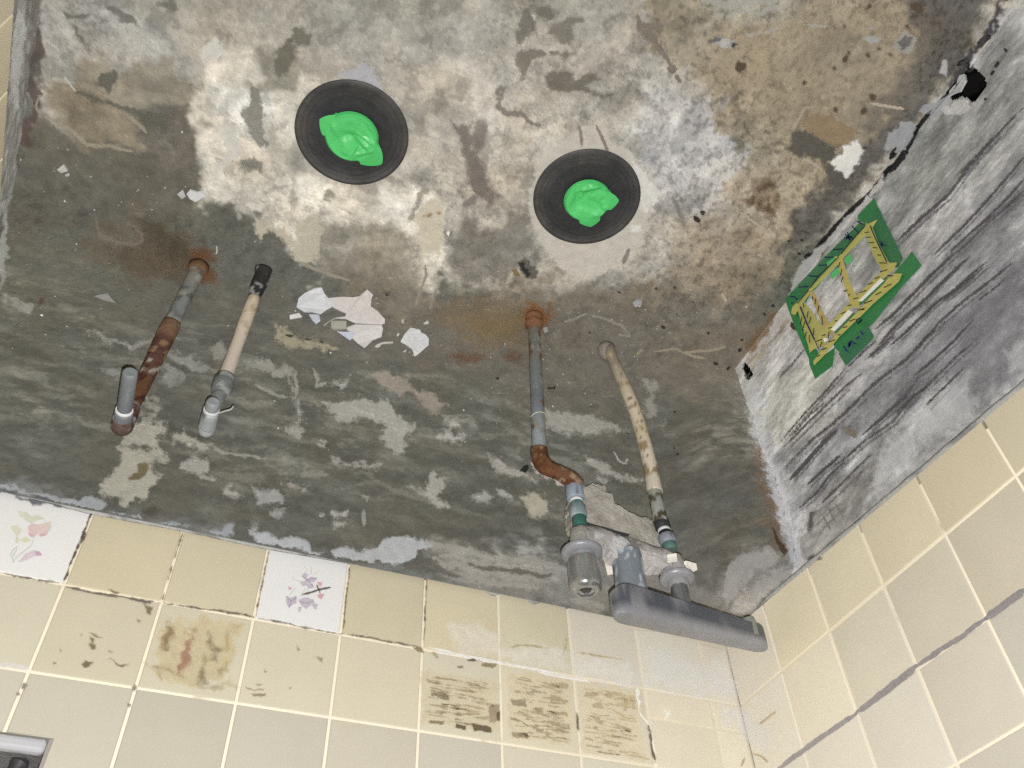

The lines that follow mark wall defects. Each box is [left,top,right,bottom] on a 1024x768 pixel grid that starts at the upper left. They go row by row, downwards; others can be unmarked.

spalling [885,52,978,153]